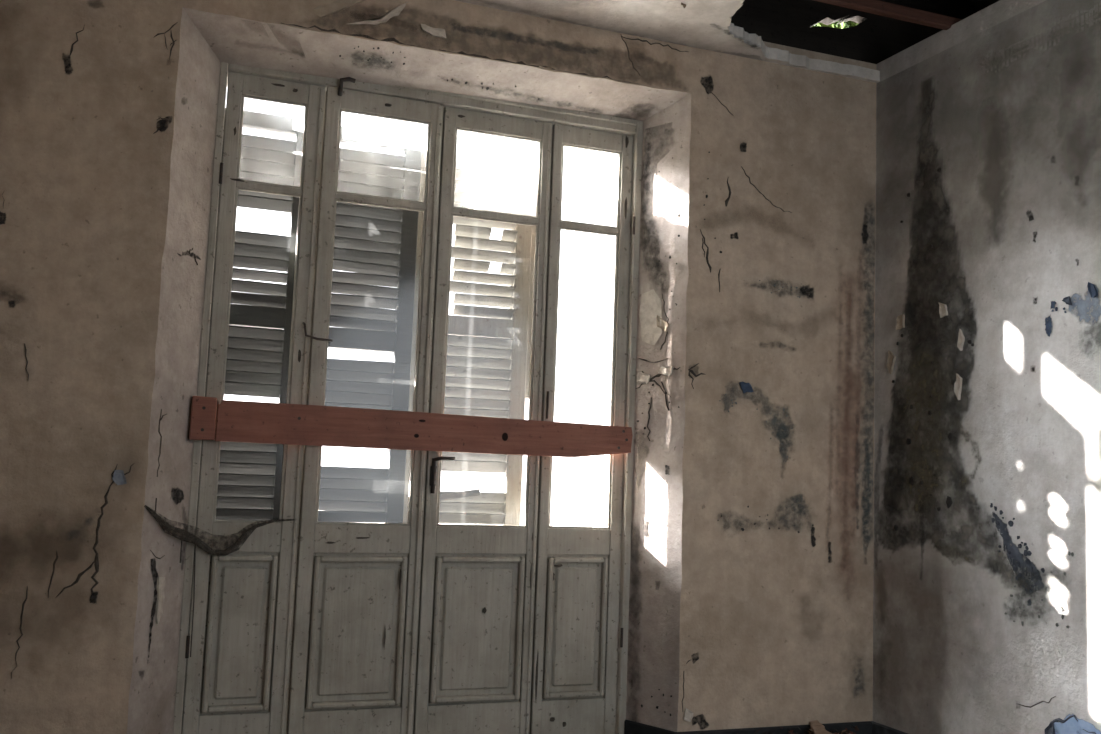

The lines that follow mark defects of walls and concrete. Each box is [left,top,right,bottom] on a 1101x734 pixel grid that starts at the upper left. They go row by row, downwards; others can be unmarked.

peeling [1045,282,1101,353]
crack [636,358,706,441]
crack [11,409,166,675]
peeling [1045,714,1101,734]